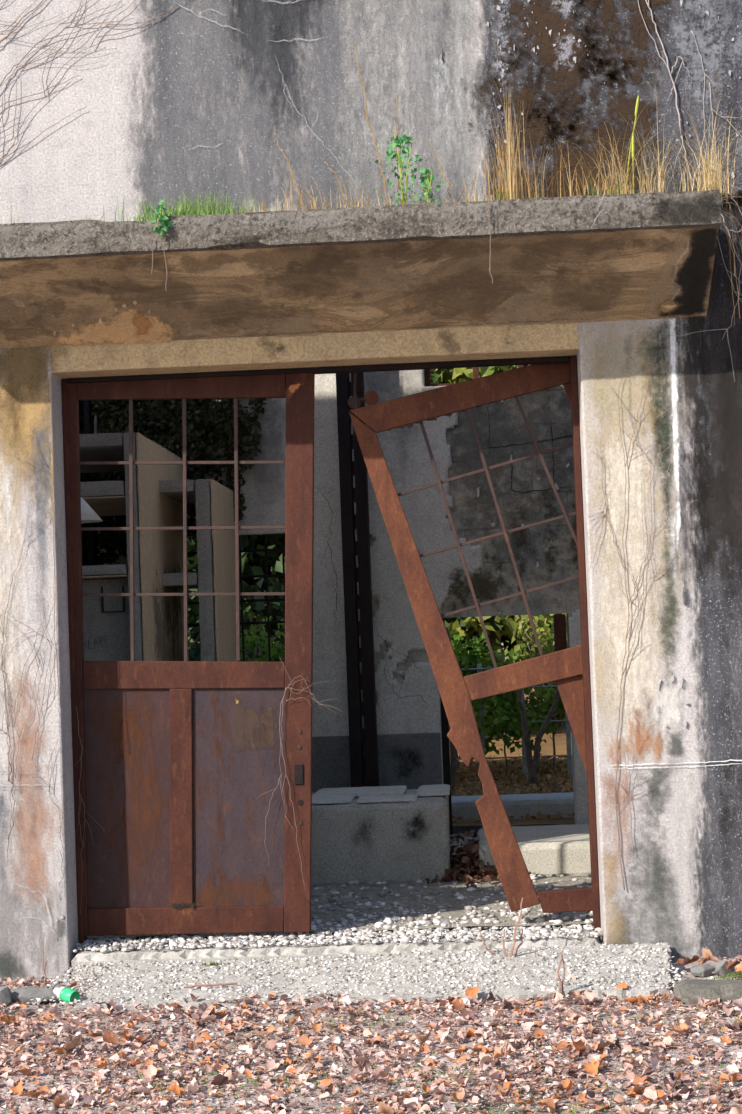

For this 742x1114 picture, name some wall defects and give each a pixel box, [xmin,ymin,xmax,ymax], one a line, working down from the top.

spalling [53,300,172,346]
water stain [0,346,55,548]
water stain [136,0,742,961]
spalling [487,407,575,493]
water stain [0,564,21,700]
rust [610,723,662,764]
water stain [0,843,61,978]